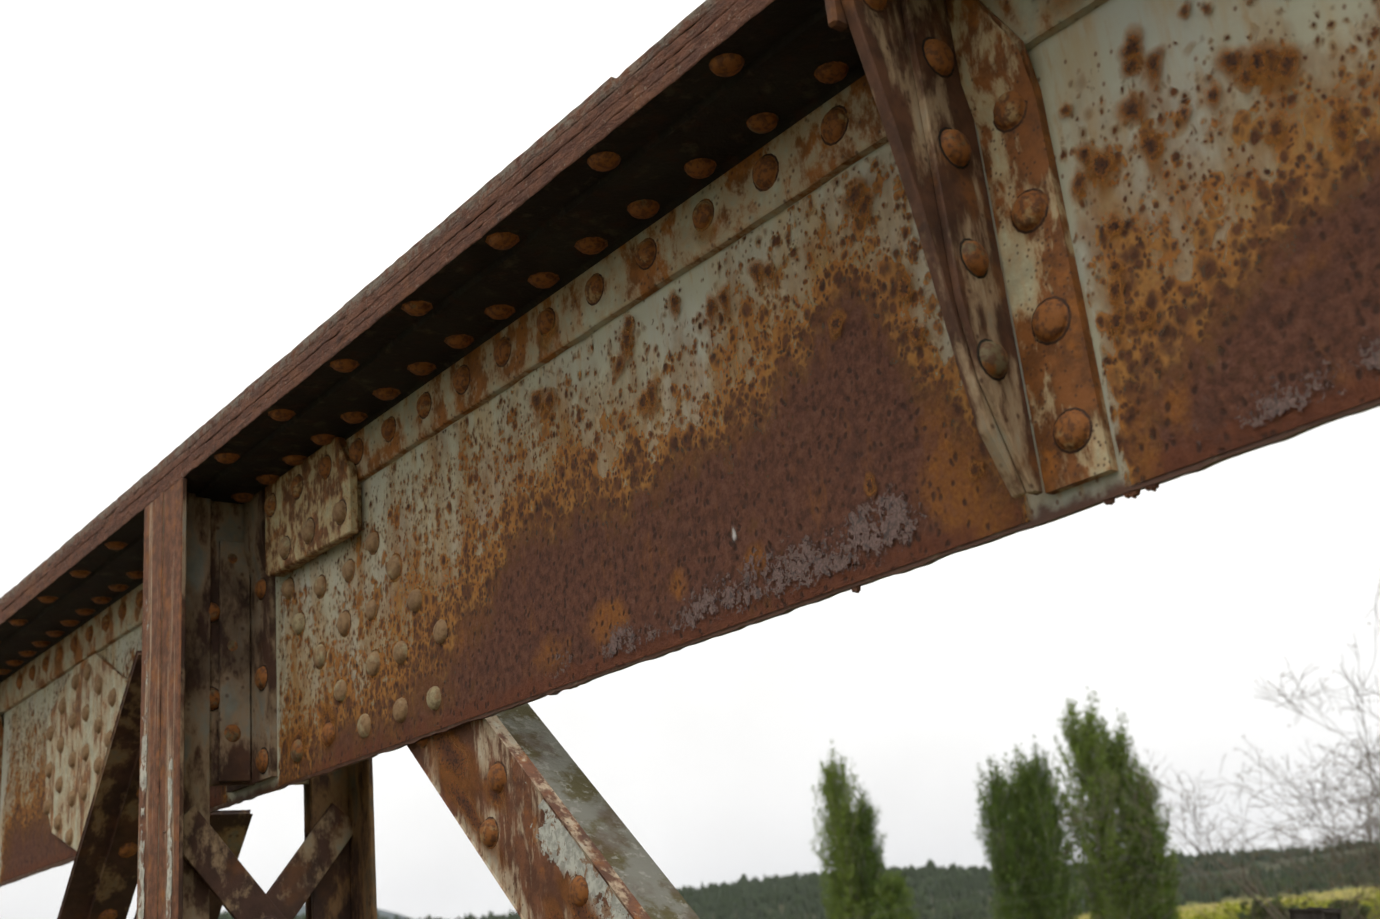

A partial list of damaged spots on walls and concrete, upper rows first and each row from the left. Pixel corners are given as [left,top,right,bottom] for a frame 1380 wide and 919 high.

corrosion [1178,1,1211,18]
corrosion [1059,13,1380,505]
peeling [1193,323,1380,445]
corrosion [277,157,1030,857]
peeling [599,482,929,659]
corrosion [0,674,77,883]
corrosion [210,786,231,808]
corrosion [546,882,599,919]